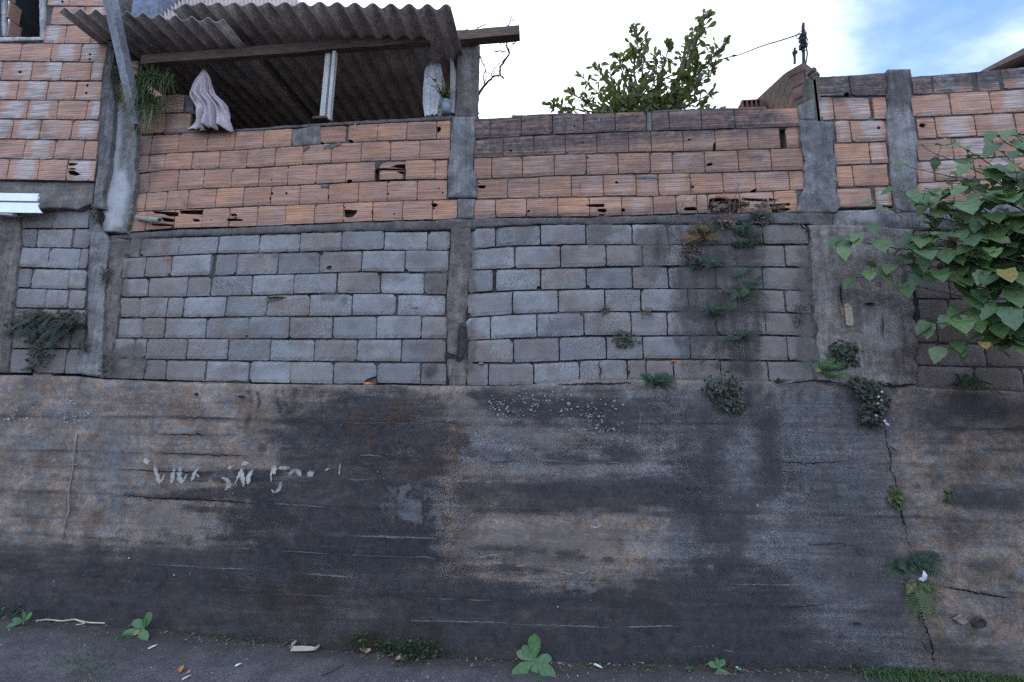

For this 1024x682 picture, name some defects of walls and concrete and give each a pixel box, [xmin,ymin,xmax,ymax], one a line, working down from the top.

spalling [707,201,738,214]
damp [0,214,887,672]
crack [885,429,911,548]
crack [919,592,936,666]